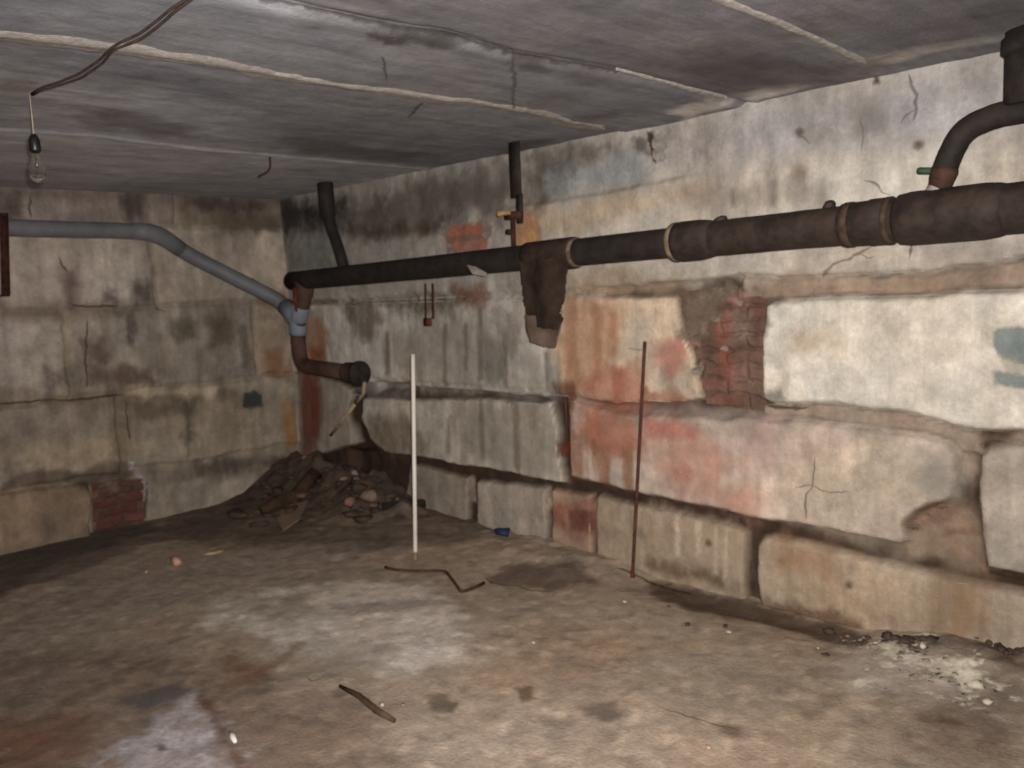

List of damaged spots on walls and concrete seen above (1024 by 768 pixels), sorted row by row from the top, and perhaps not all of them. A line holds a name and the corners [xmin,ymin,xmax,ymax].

crack [264,0,619,109]
spalling [678,279,782,410]
rust [302,372,321,455]
rust [553,365,683,490]
spalling [92,479,145,532]
water stain [619,568,1024,709]